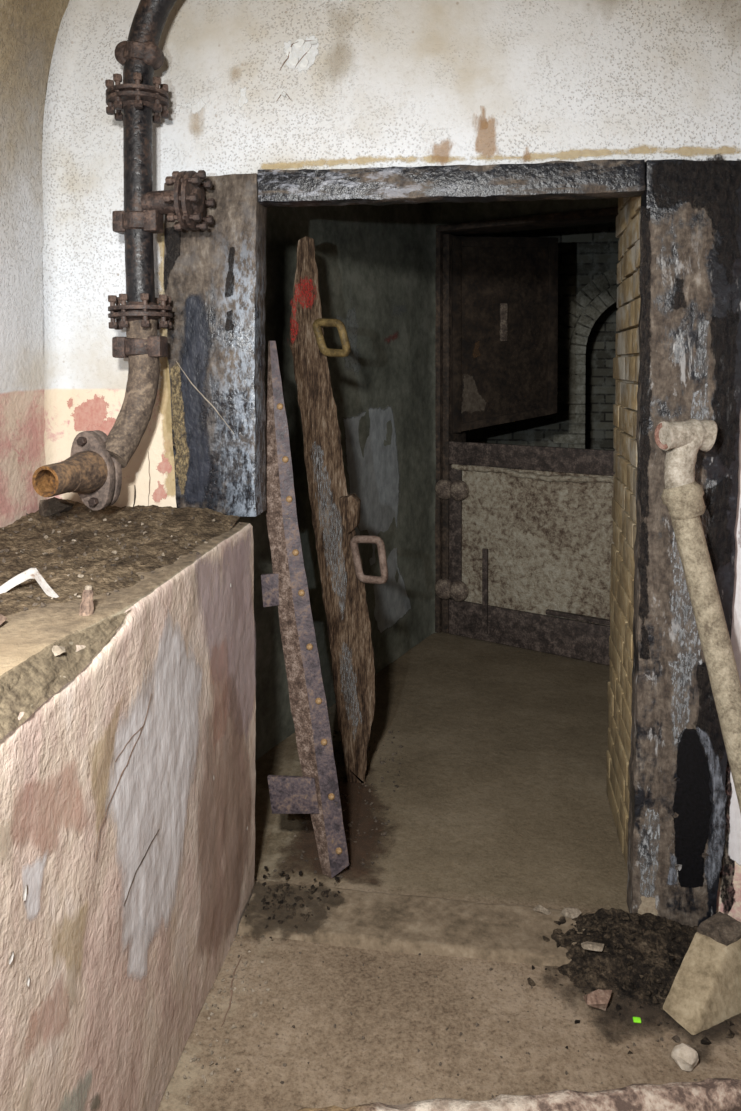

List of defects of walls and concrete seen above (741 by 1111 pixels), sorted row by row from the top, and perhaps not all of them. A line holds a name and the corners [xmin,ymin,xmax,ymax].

peeling [279,35,319,73]
damp [262,155,456,169]
corrosion [434,141,452,163]
corrosion [476,109,495,157]
damp [477,146,739,160]
peeling [67,394,116,436]
peeling [152,454,172,502]
peeling [731,411,741,682]
peeling [728,773,741,865]